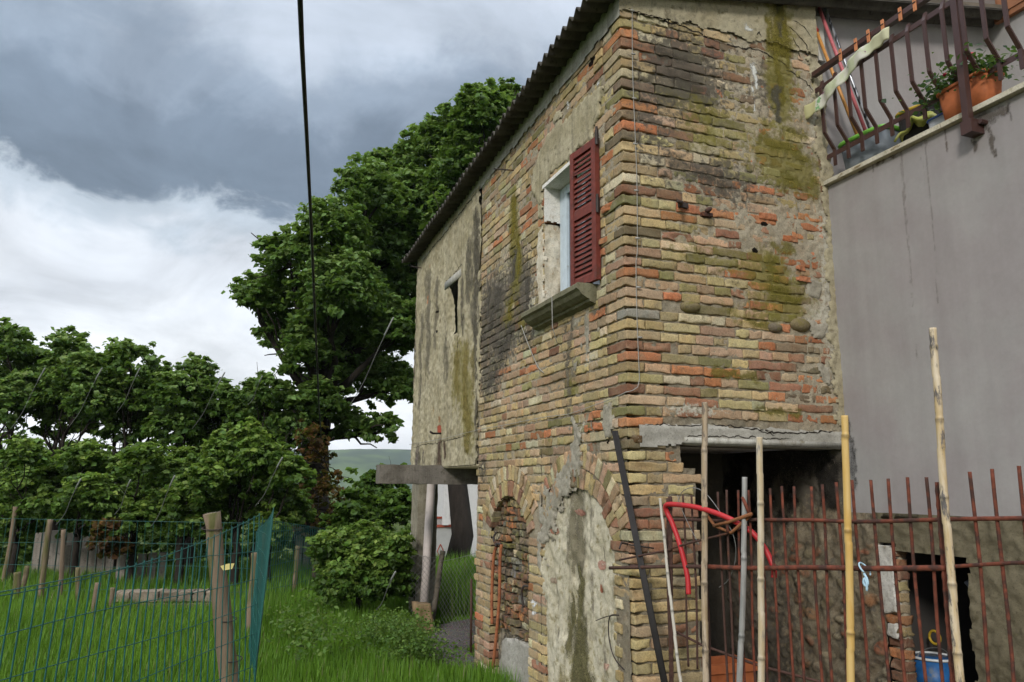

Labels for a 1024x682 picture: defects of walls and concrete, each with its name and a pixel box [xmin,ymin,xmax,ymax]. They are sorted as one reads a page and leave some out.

crack [628,8,812,89]
damp [765,4,790,123]
peeling [531,85,604,304]
damp [418,211,530,454]
spalling [584,410,609,444]